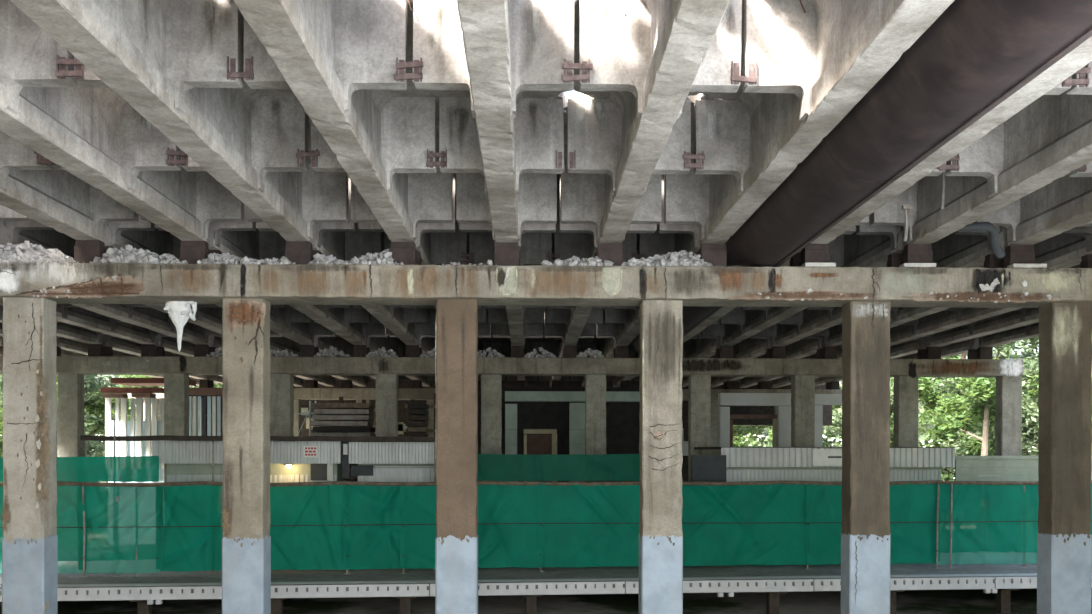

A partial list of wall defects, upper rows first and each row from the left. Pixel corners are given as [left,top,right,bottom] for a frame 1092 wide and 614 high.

spalling [22,275,146,299]
spalling [905,278,1061,303]
rust [936,292,1051,300]
crack [248,313,264,365]
crack [7,422,44,485]
crack [649,424,680,471]